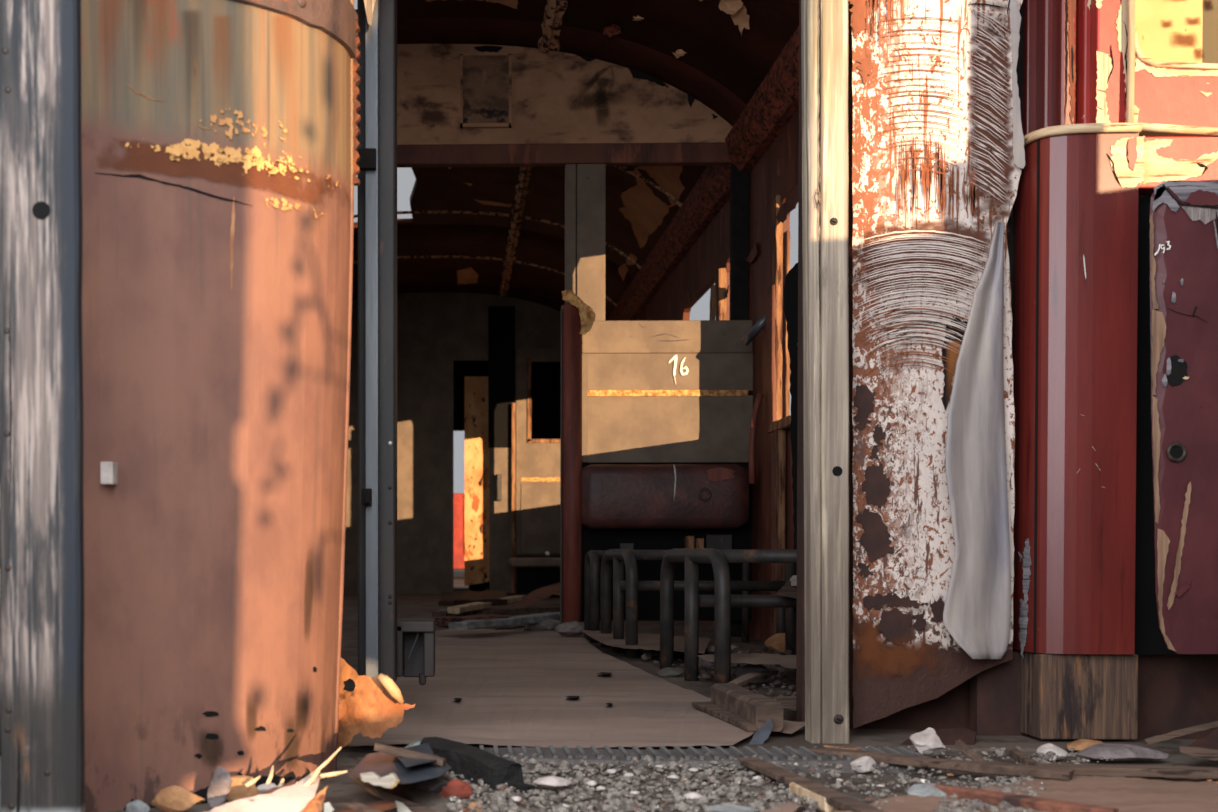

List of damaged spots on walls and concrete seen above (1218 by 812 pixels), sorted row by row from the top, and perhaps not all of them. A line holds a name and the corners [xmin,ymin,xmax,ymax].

peeling [479,0,518,9]
peeling [719,0,750,36]
peeling [848,0,870,38]
peeling [856,55,873,84]
peeling [1065,0,1103,124]
peeling [1095,0,1218,188]
rust [114,107,338,219]
spalling [1162,355,1189,387]
peeling [853,222,1032,659]
peeling [1167,481,1192,610]